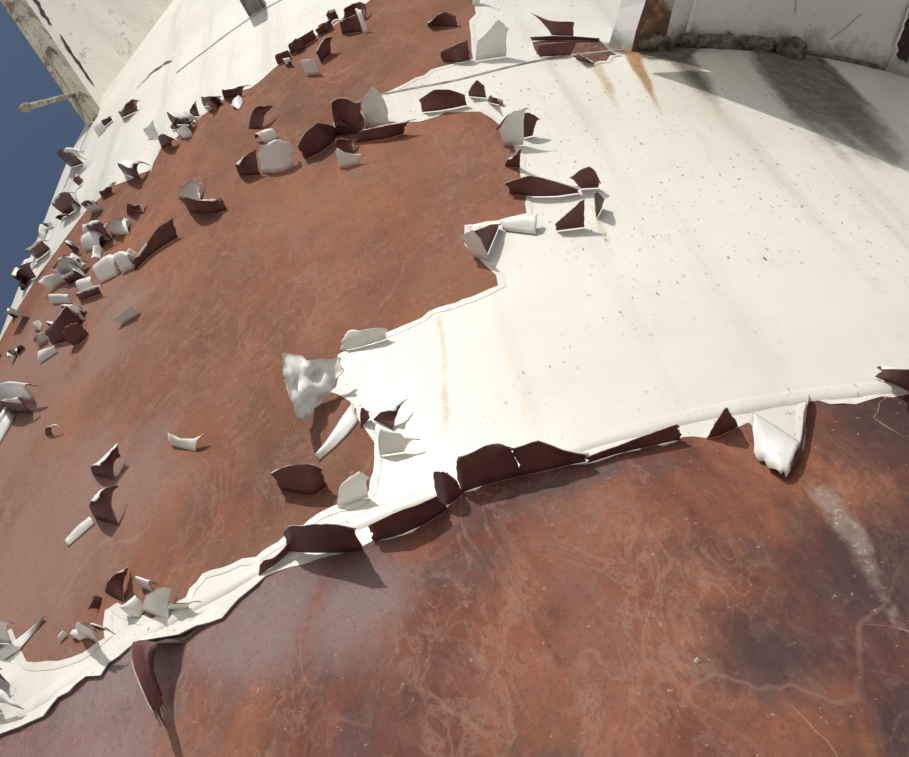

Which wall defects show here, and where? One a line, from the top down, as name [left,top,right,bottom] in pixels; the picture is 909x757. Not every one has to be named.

peeling [893,7,909,65]
water stain [754,50,896,154]
peeling [594,192,606,218]
peeling [0,0,601,671]
peeling [875,366,909,391]
peeling [0,392,909,757]